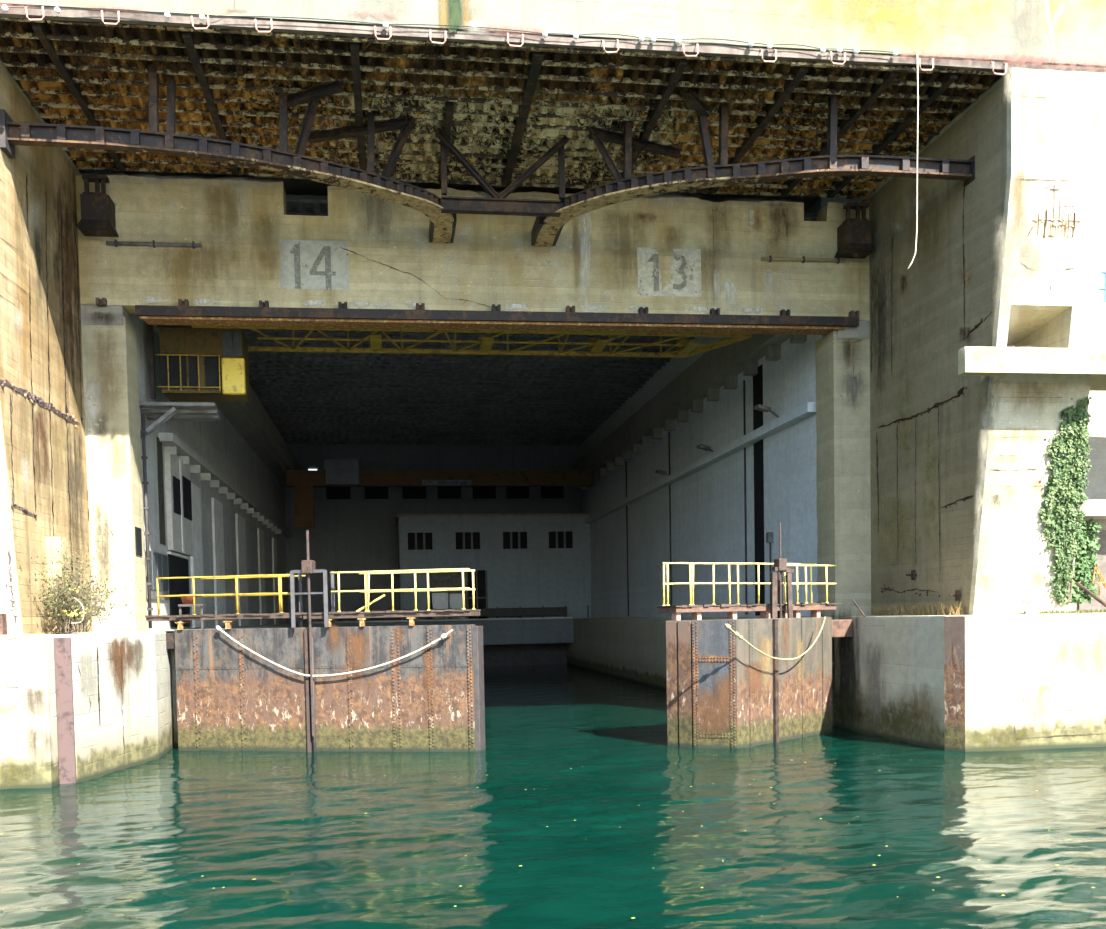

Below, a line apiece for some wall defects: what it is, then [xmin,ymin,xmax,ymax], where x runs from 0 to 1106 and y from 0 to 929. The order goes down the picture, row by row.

crack [340,247,490,307]
damp [20,403,83,542]
rust [112,640,132,693]
rust [330,626,365,669]